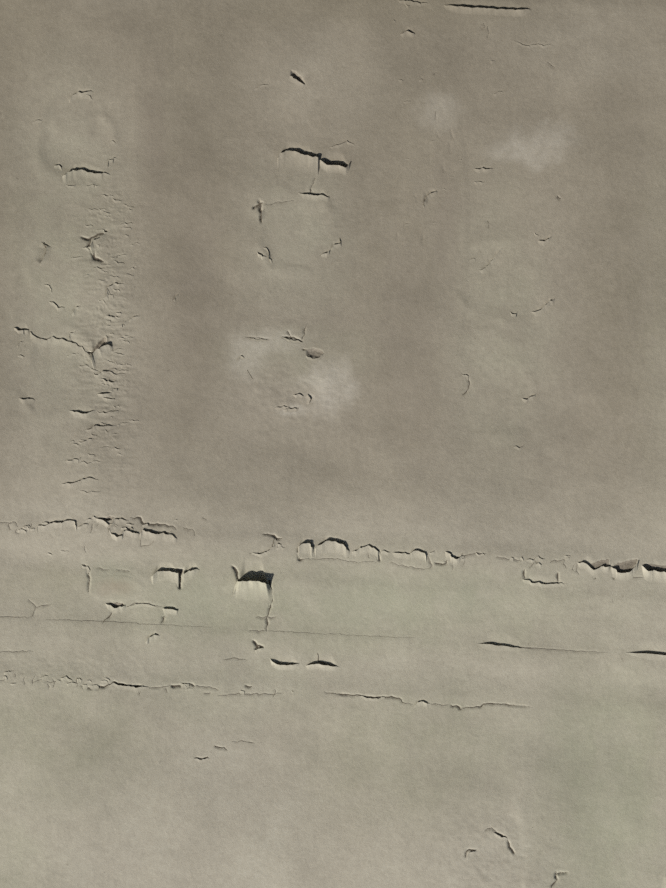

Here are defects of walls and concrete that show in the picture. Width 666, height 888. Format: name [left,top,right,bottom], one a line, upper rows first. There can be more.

peeling [443,5,532,17]
peeling [278,151,350,203]
crack [40,241,52,266]
crack [81,230,107,262]
crack [14,328,90,360]
peeling [3,516,193,547]
peeling [297,541,485,570]
peeling [151,569,200,588]
peeling [563,556,666,583]
crack [33,676,281,696]
crack [325,692,529,710]
crack [486,828,514,853]